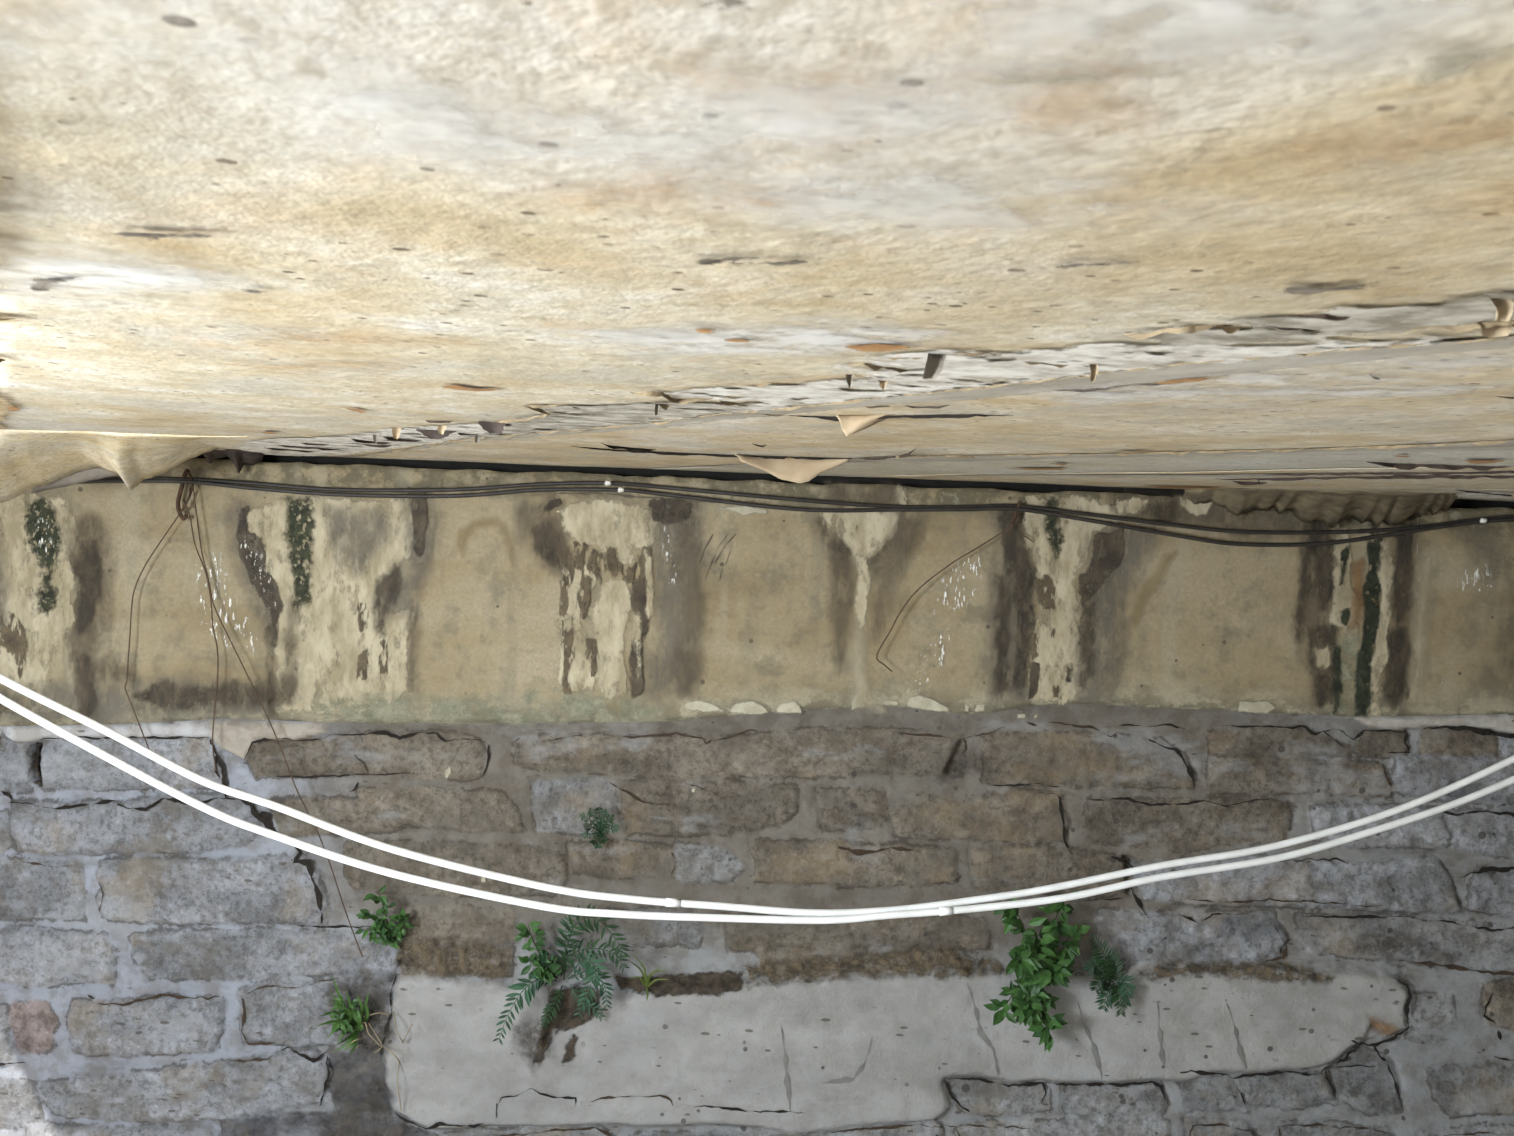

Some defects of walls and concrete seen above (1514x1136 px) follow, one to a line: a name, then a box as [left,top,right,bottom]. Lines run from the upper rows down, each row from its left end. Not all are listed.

spalling [703,0,746,9]
spalling [114,232,210,240]
spalling [697,257,808,266]
spalling [1058,261,1133,269]
spalling [31,277,74,291]
peeling [0,285,1514,504]
crack [1221,461,1514,485]
flaking render [1145,486,1514,528]
water stain [0,487,701,724]
water stain [822,486,918,706]
water stain [993,494,1433,716]